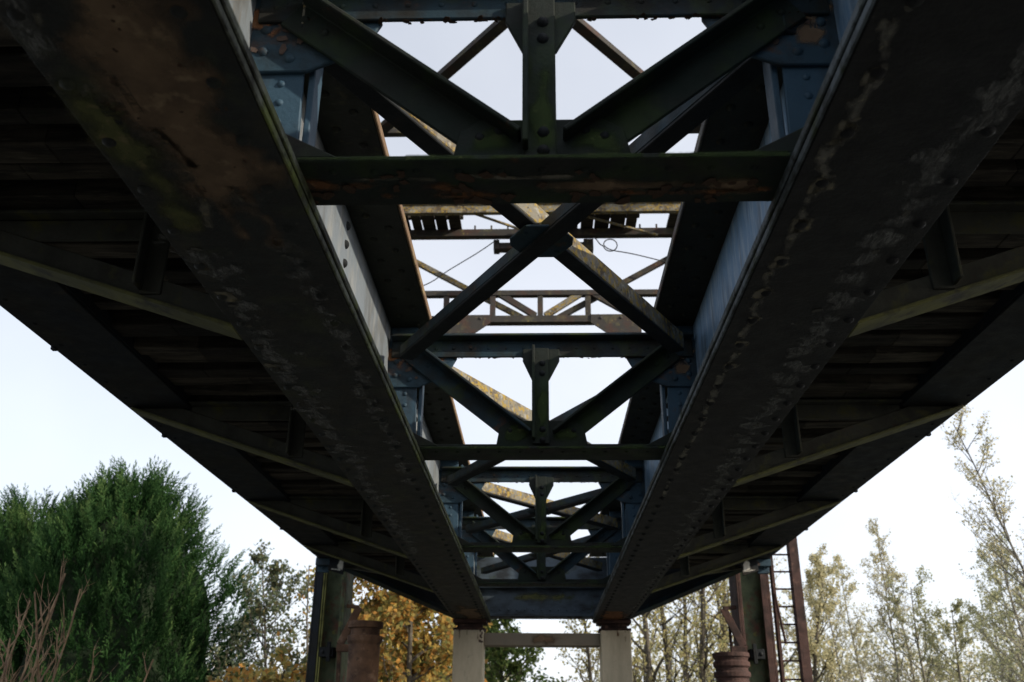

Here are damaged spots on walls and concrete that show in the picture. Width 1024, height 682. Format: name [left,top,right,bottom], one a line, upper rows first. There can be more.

peeling [187,248,418,554]
corrosion [425,171,572,205]
peeling [662,255,790,494]
peeling [694,20,1024,511]